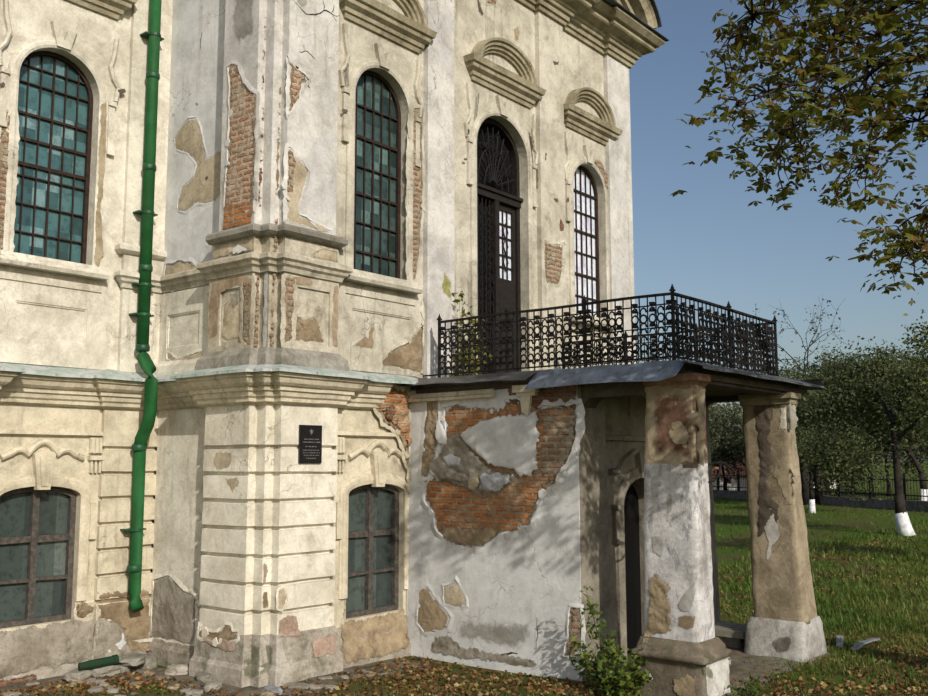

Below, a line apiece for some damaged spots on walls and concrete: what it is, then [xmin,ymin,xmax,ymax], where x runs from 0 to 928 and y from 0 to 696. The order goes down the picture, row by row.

crack [296,2,340,20]
spalling [279,51,312,119]
flaking render [0,107,20,252]
spalling [173,59,265,231]
flaking render [275,128,333,235]
flaking render [214,237,254,259]
flaking render [310,246,339,264]
spalling [542,219,566,288]
spalling [352,301,585,557]
flaking render [0,571,240,686]
flaking render [312,575,537,667]
flaking render [642,573,696,643]